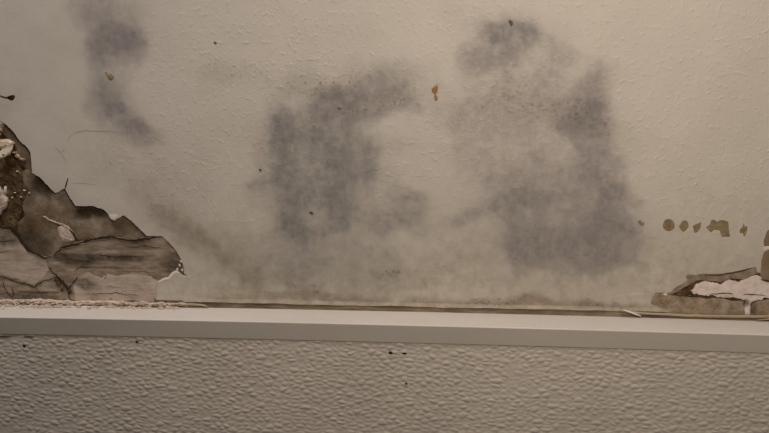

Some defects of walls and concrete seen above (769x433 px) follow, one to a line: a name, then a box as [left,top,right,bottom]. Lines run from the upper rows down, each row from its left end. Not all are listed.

spalling [0,121,187,307]
peeling [663,219,730,237]
peeling [651,230,769,315]